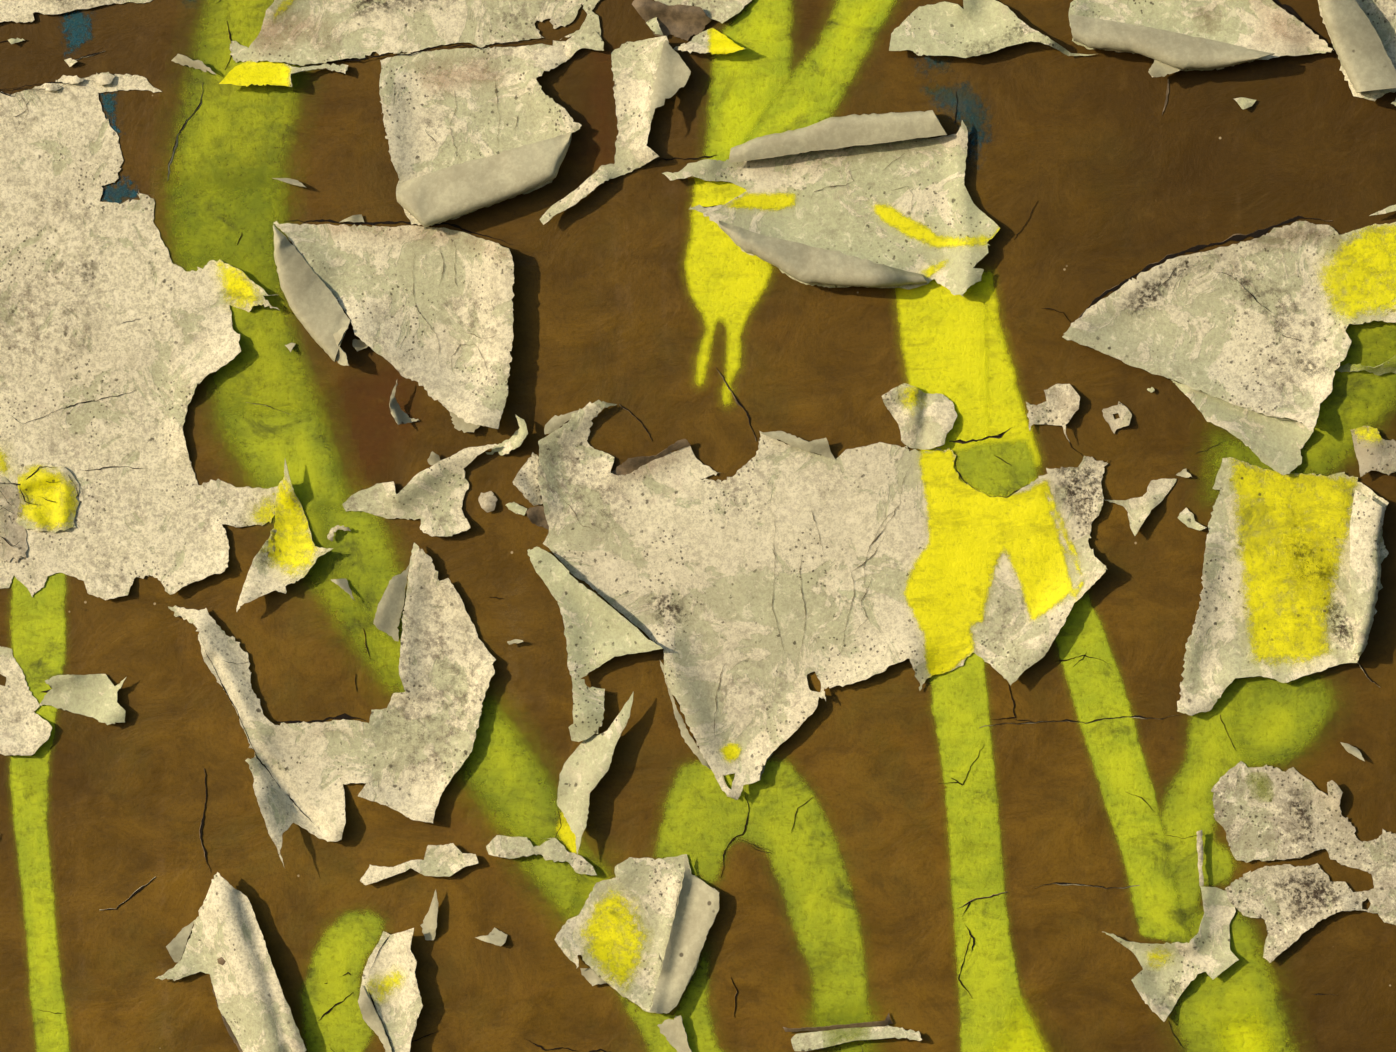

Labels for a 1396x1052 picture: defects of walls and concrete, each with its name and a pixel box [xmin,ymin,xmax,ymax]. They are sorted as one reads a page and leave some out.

peeling [889,0,1396,106]
peeling [1234,97,1256,110]
peeling [662,110,1000,297]
peeling [0,0,752,868]
peeling [1062,205,1396,716]
peeling [342,383,1192,1052]
crack [938,684,1182,786]
peeling [155,872,306,1052]
crack [531,1042,606,1052]
peeling [1105,761,1396,1022]